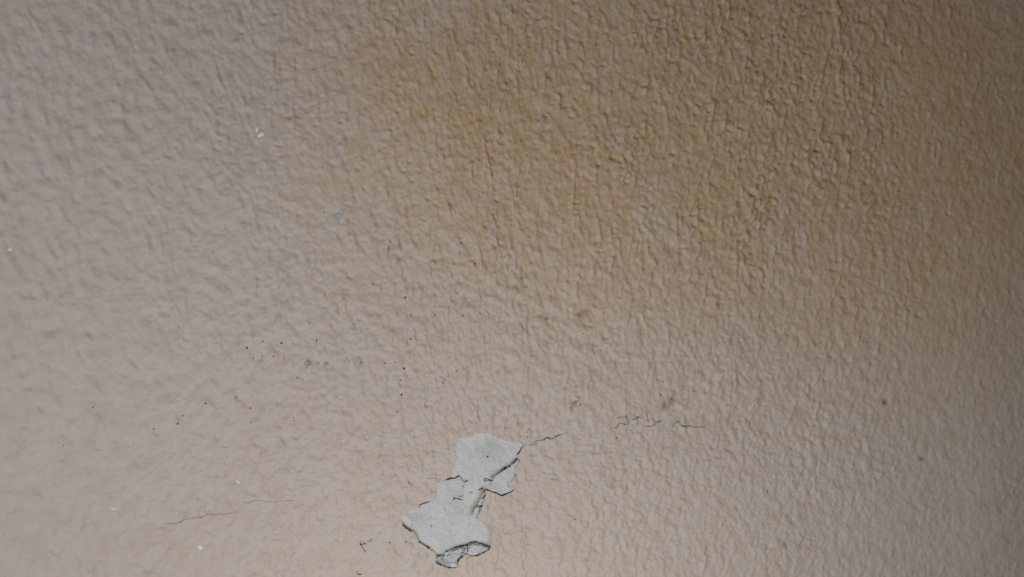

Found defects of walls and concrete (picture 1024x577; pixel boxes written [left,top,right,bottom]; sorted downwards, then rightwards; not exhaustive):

crack [580,404,702,429]
peeling [401,432,522,568]